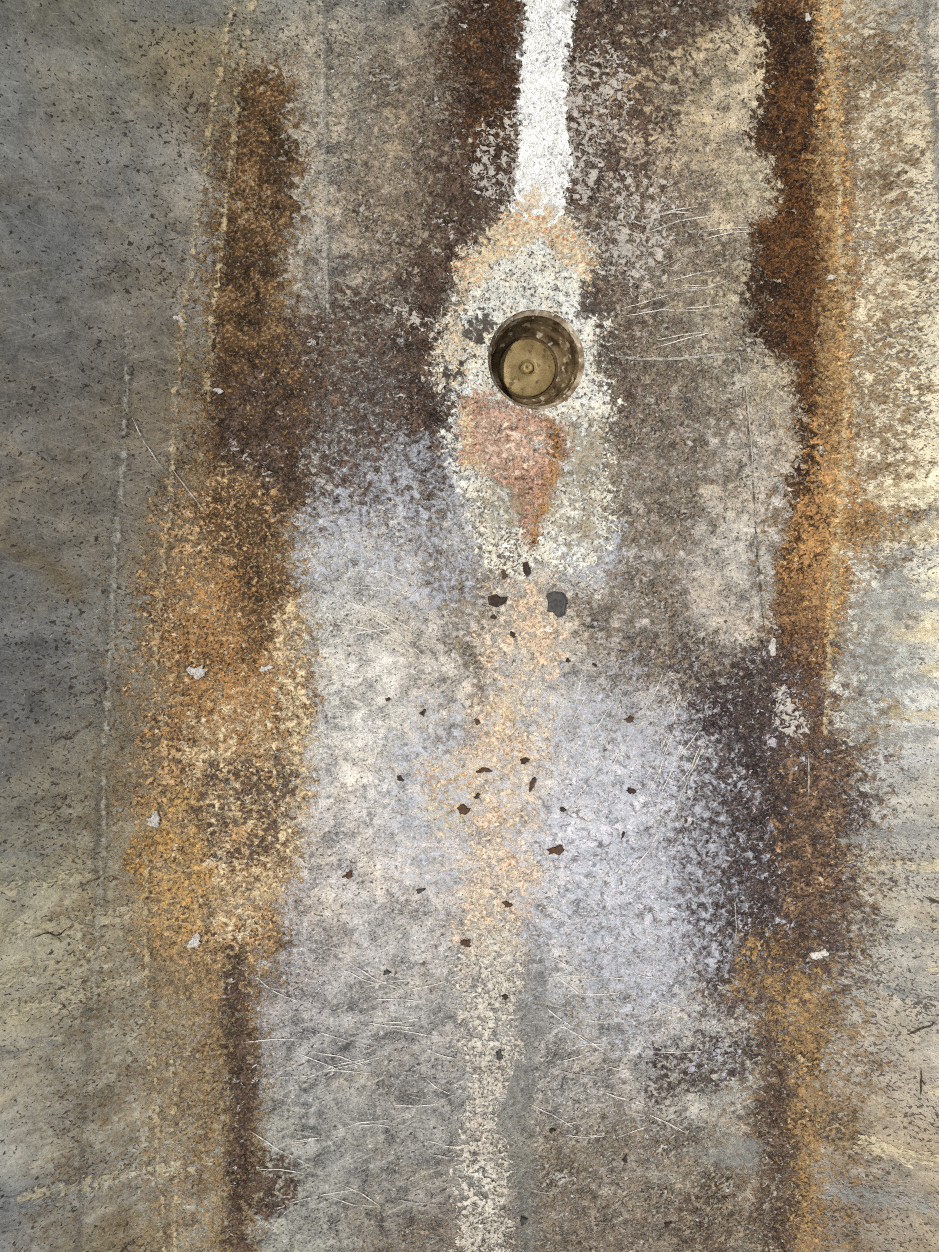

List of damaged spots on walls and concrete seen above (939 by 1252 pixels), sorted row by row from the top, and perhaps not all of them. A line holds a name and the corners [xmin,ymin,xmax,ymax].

water stain [302,0,733,1252]
corrosion [348,0,939,1252]